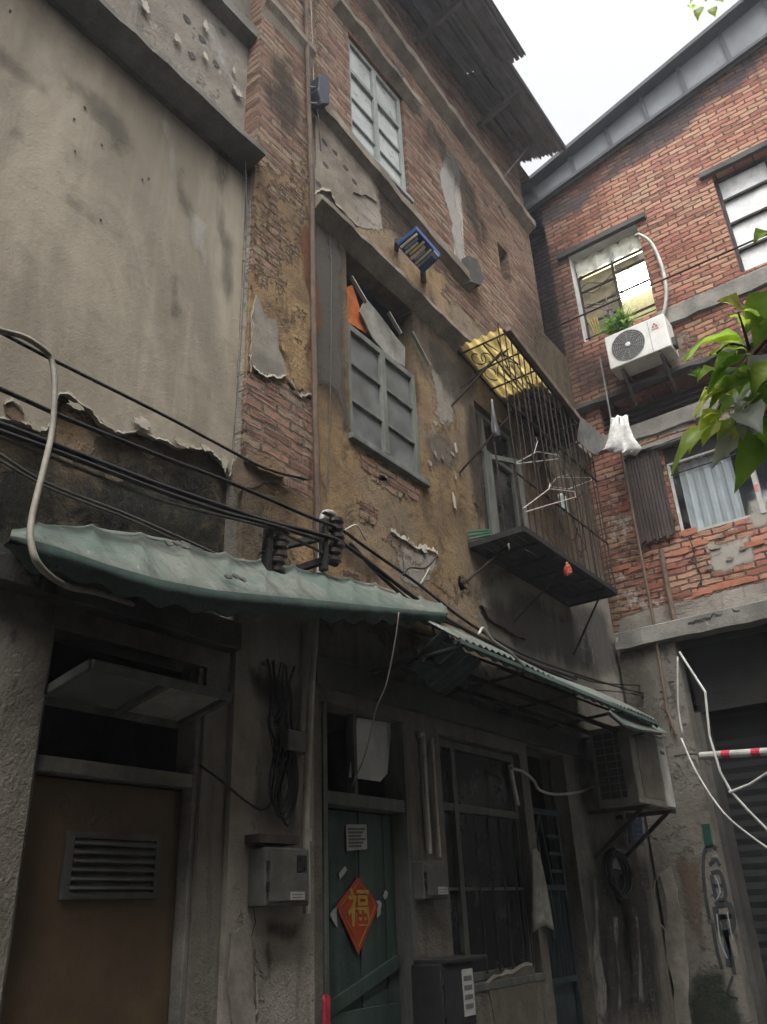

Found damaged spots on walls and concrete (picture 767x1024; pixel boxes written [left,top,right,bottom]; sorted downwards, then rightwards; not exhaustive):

peeling [173,14,244,99]
peeling [314,116,377,227]
flaking render [0,295,312,493]
flaking render [360,454,422,502]
flaking render [382,528,470,603]